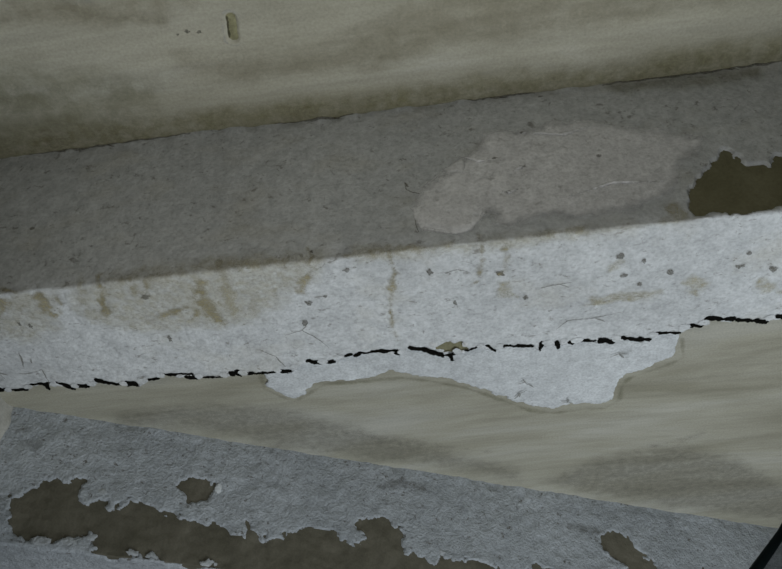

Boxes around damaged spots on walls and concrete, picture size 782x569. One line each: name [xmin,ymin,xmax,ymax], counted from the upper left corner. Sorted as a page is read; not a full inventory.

spalling [688,147,782,222]
peeling [0,314,782,392]
spalling [8,477,500,569]
spalling [601,531,657,569]